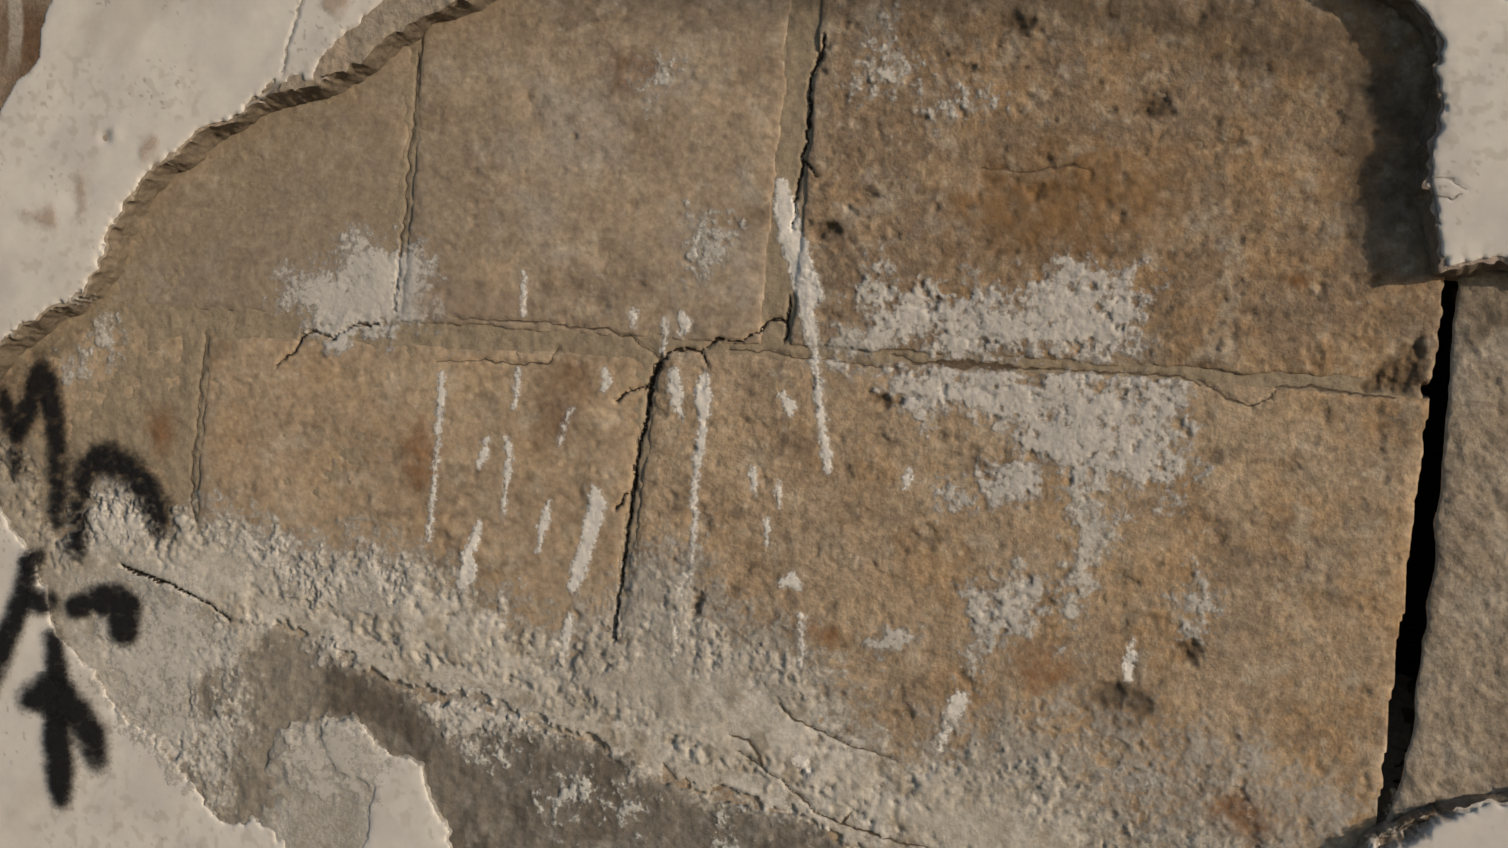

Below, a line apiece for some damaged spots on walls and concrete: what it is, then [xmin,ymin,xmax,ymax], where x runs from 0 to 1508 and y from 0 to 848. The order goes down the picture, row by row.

spalling [0,0,497,392]
crack [276,53,420,366]
crack [791,34,826,225]
peeling [836,2,1010,136]
spalling [1370,0,1508,281]
peeling [66,472,258,815]
crack [122,564,231,620]
peeling [193,522,418,676]
peeling [411,678,564,755]
crack [437,280,1458,823]
peeling [805,235,1214,695]
peeling [914,690,1508,848]